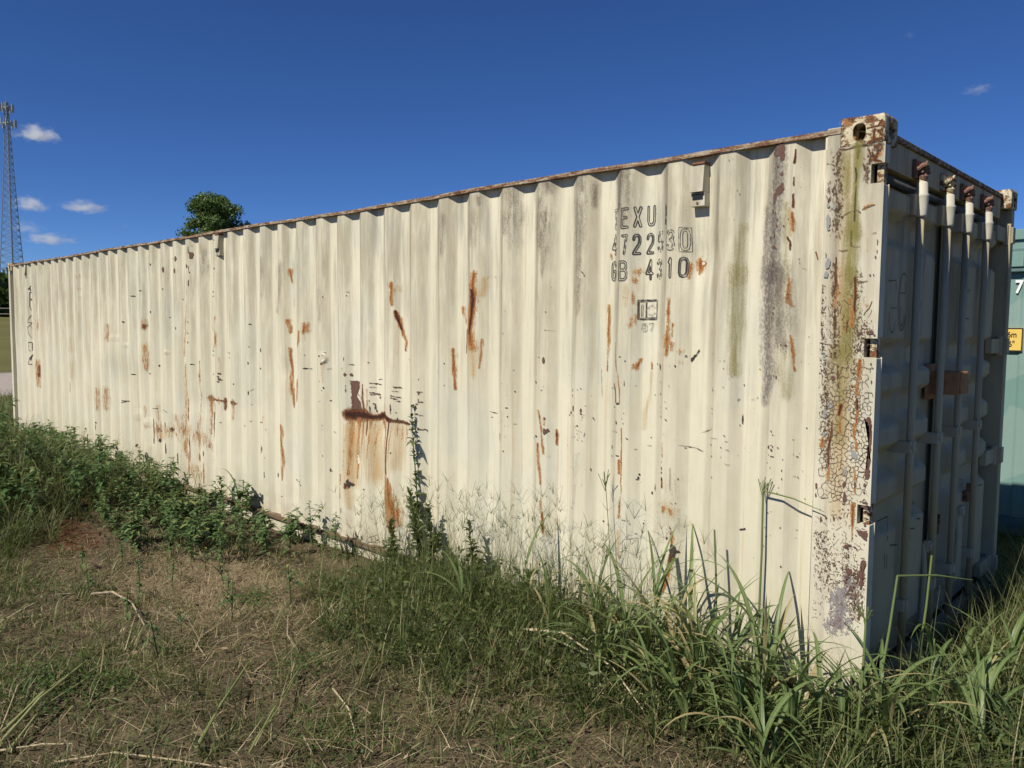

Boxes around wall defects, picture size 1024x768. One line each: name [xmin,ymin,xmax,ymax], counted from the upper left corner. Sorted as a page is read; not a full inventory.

rust [839,117,885,162]
rust [144,361,236,484]
rust [285,319,309,406]
rust [339,384,410,531]
rust [389,281,408,351]
rust [451,270,485,390]
rust [663,297,684,363]
water stain [762,145,786,403]
rust [787,177,796,250]
peeling [806,252,875,636]
crack [812,245,873,631]
water stain [846,156,858,279]